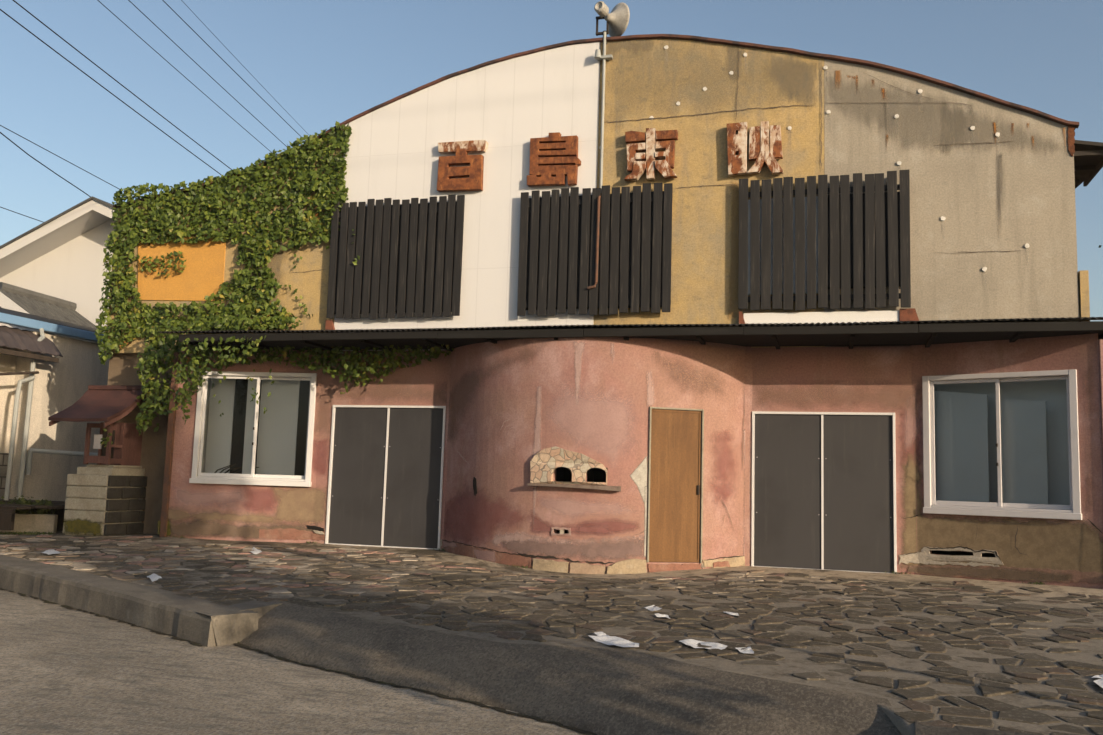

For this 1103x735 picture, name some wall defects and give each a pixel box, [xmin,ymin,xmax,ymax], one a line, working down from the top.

damp [444,486,644,561]
peeling [903,445,1103,581]